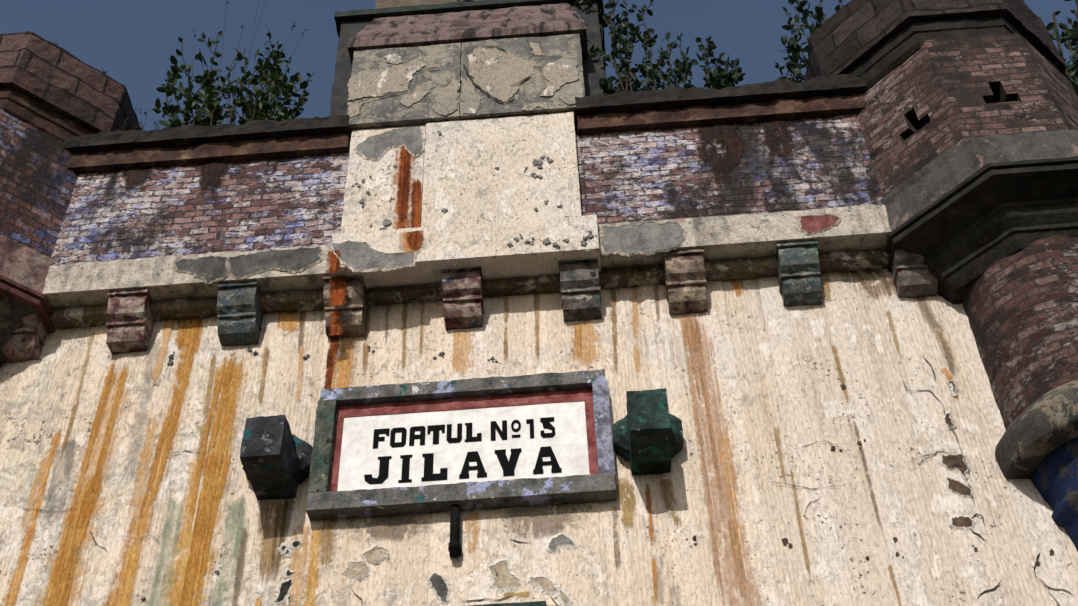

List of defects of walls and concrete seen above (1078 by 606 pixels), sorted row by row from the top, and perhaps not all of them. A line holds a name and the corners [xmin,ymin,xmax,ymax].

spalling [174,239,417,284]
corrosion [324,250,360,389]
spalling [353,127,425,162]
corrosion [393,145,424,252]
peeling [347,42,584,118]
spalling [507,221,687,257]
leakage [2,334,94,606]
leakage [34,364,129,606]
leakage [106,319,201,606]
leakage [161,354,246,606]
crack [903,356,987,541]
spalling [939,453,974,499]